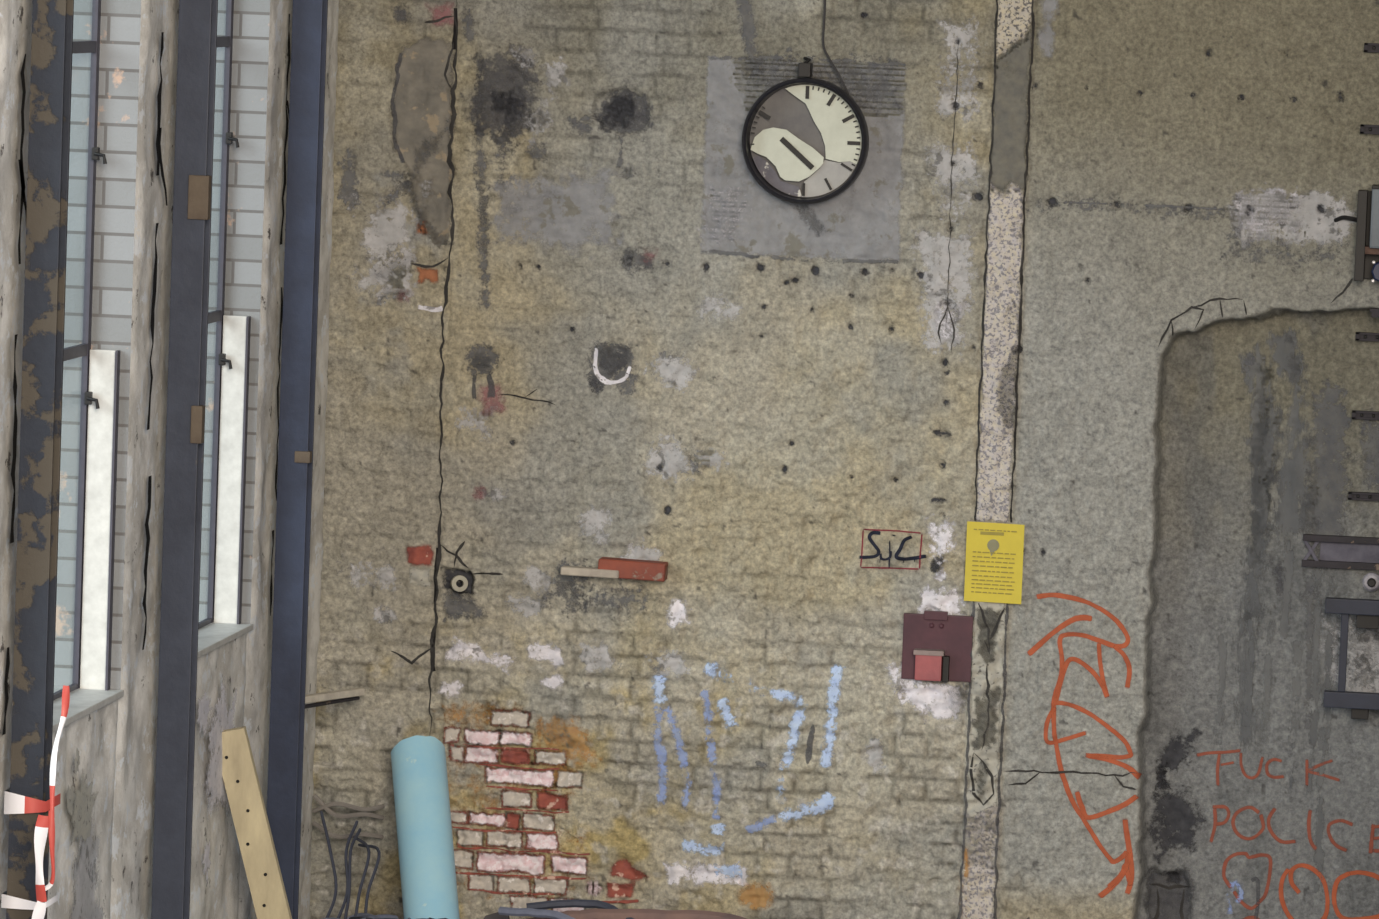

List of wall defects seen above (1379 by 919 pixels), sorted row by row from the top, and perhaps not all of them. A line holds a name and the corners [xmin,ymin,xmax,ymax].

crack [1331,279,1353,303]
crack [1158,298,1247,347]
crack [391,0,468,732]
peeling [646,434,729,483]
peeling [620,540,661,561]
peeling [666,599,691,628]
water stain [1149,327,1379,892]
peeling [445,636,613,688]
peeling [440,680,464,698]
spalling [443,709,648,912]
peeling [663,861,748,887]
spalling [1143,867,1195,919]